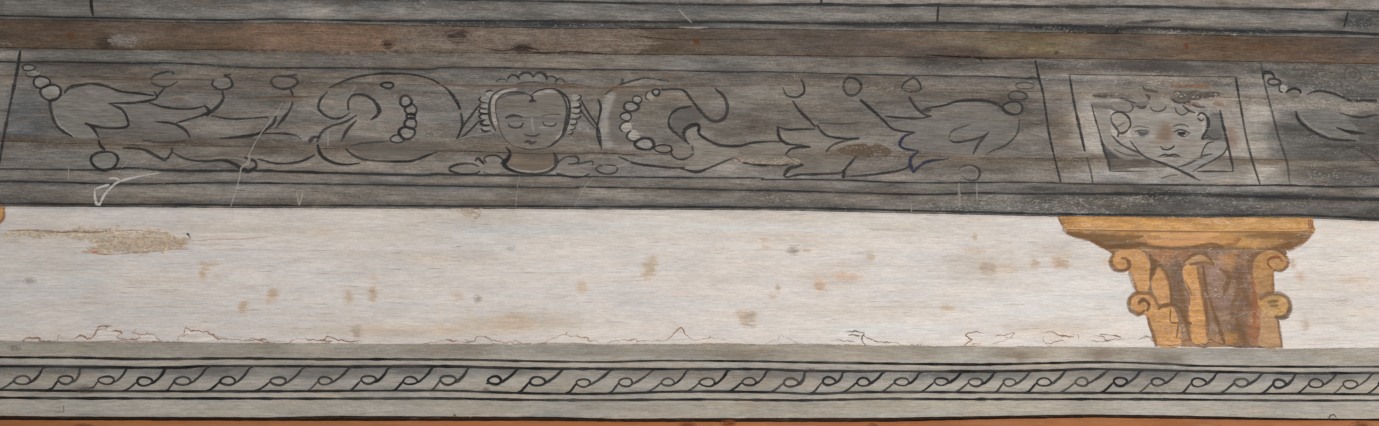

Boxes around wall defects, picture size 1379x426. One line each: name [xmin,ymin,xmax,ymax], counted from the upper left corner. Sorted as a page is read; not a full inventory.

peeling [4,225,191,256]